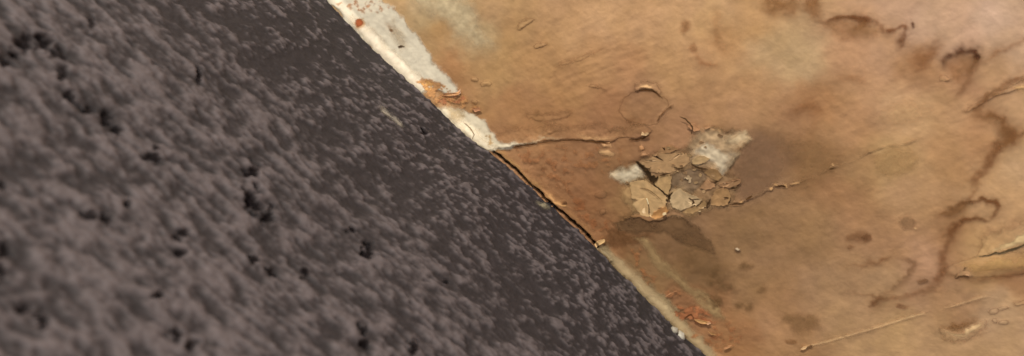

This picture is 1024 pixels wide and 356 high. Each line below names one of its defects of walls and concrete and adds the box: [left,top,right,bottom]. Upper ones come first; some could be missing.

damp [829,15,871,30]
damp [920,48,980,70]
peeling [438,81,673,151]
spalling [610,117,751,221]
damp [974,95,1024,180]
damp [604,215,723,317]
damp [919,196,1001,283]